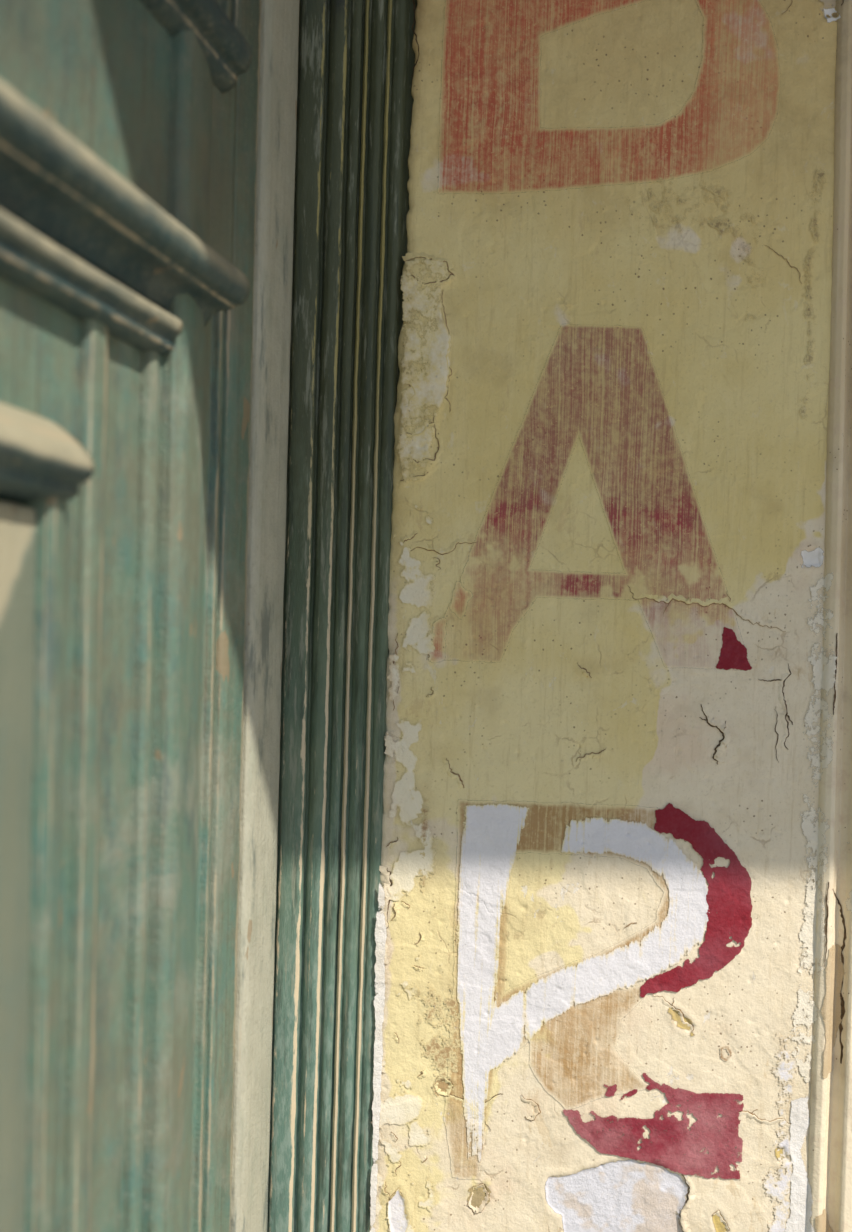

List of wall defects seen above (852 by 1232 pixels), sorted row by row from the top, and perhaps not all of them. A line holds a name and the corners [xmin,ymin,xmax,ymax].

flaking render [820,0,844,22]
crack [410,538,477,555]
flaking render [386,505,440,700]
crack [628,586,786,632]
crack [699,704,731,765]
crack [758,664,793,761]
flaking render [370,687,438,1232]
flaking render [545,1160,688,1232]
crack [679,1174,697,1232]